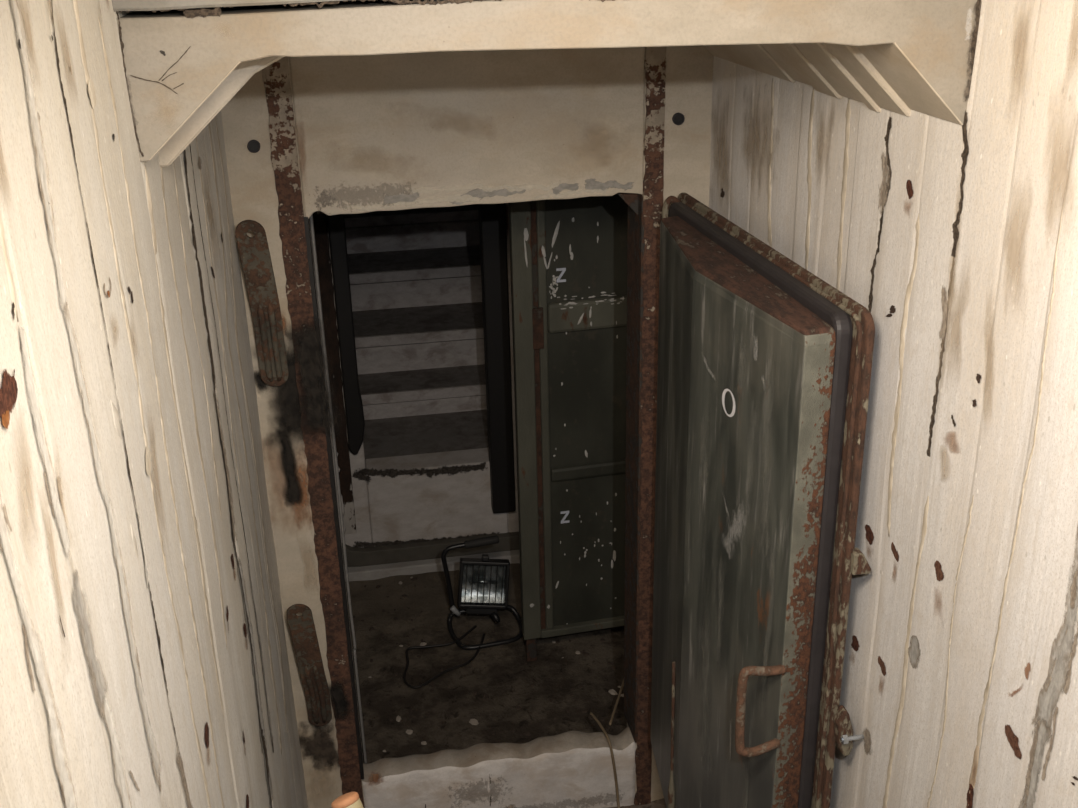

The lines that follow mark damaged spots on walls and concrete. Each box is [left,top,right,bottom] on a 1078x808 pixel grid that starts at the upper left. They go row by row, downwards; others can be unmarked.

crack [279,0,501,9]
crack [116,6,240,157]
peeling [343,178,634,211]
crack [927,112,969,457]
spalling [0,217,70,556]
crack [49,0,193,808]
rust [294,465,309,519]
rust [865,524,874,552]
rust [934,561,944,581]
spalling [0,494,77,808]
spalling [1005,526,1078,808]